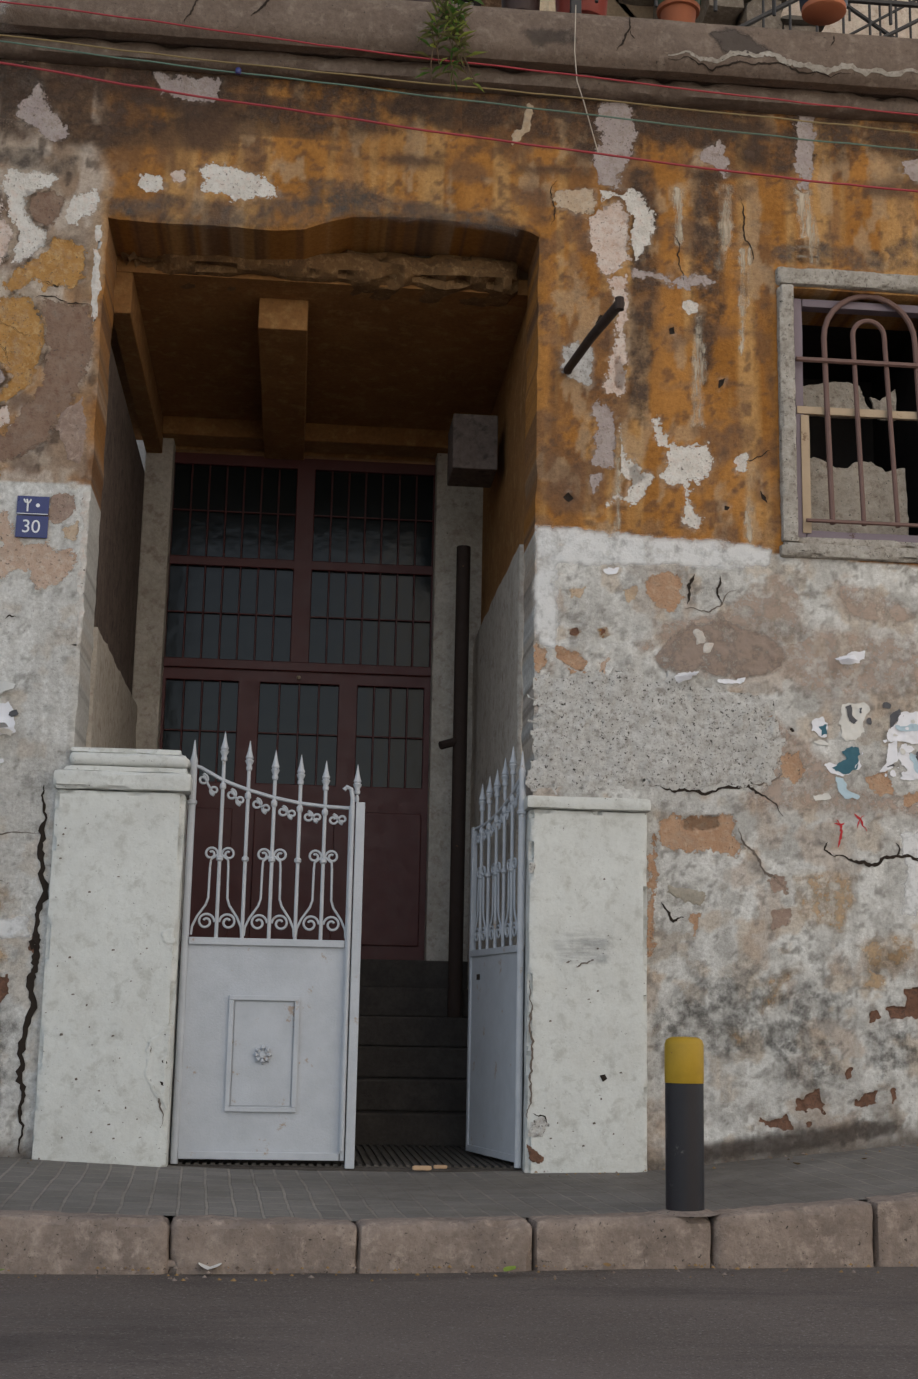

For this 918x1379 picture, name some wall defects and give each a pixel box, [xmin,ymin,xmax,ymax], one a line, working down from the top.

peeling [697,139,730,179]
spalling [0,168,102,476]
peeling [550,101,716,529]
spalling [623,570,805,679]
spalling [655,751,806,816]
spalling [658,812,853,931]
crack [824,842,918,867]
peeling [0,905,34,1003]
crack [0,786,49,1154]
spalling [869,987,918,1023]
spalling [759,1088,826,1131]
spalling [854,1087,897,1108]